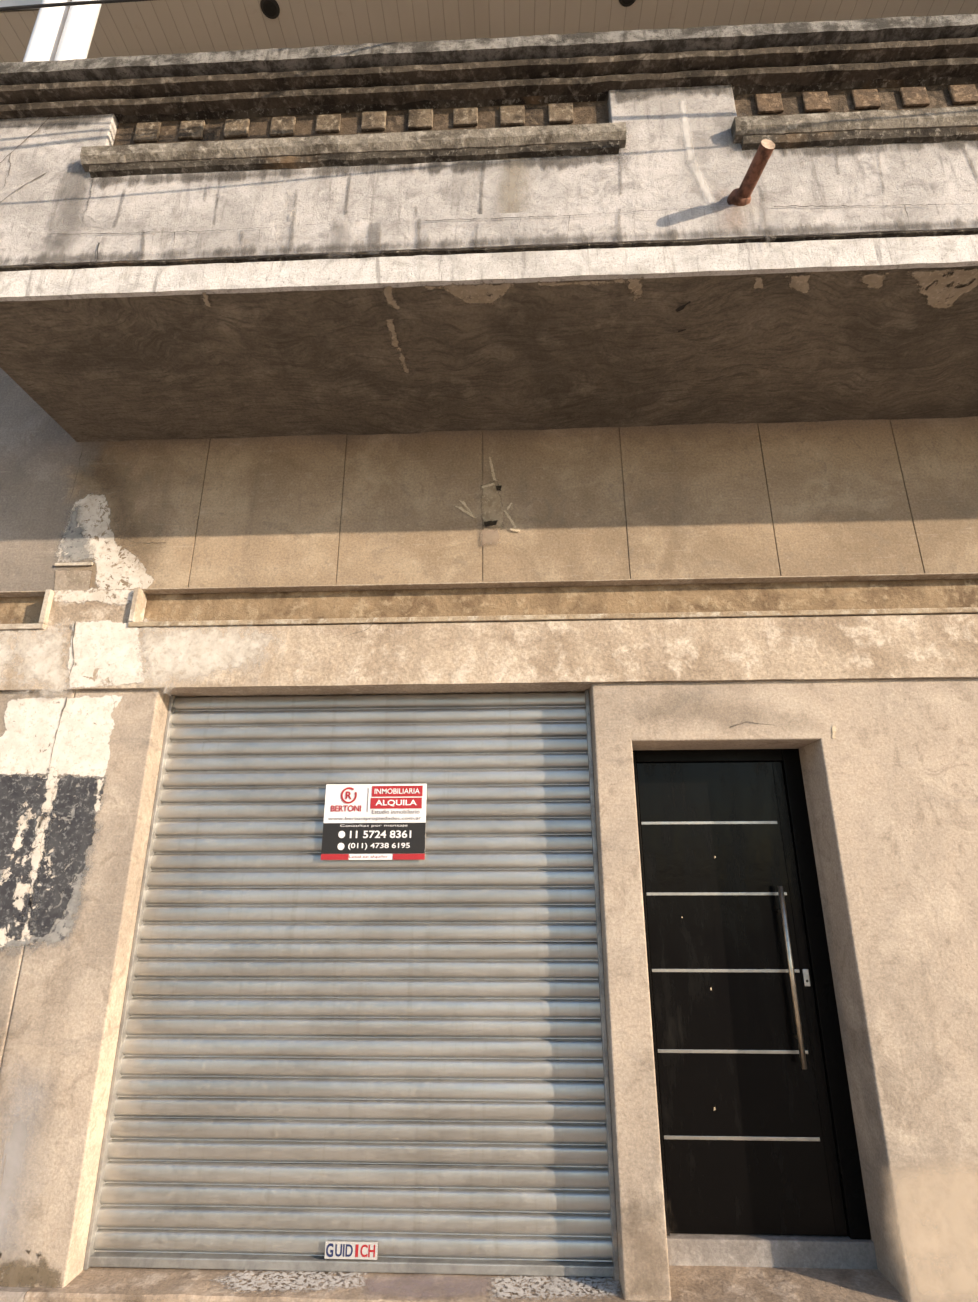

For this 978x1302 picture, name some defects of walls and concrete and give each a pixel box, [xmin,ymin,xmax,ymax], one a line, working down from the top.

spalling [858,272,889,289]
spalling [908,269,978,309]
peeling [0,493,271,950]